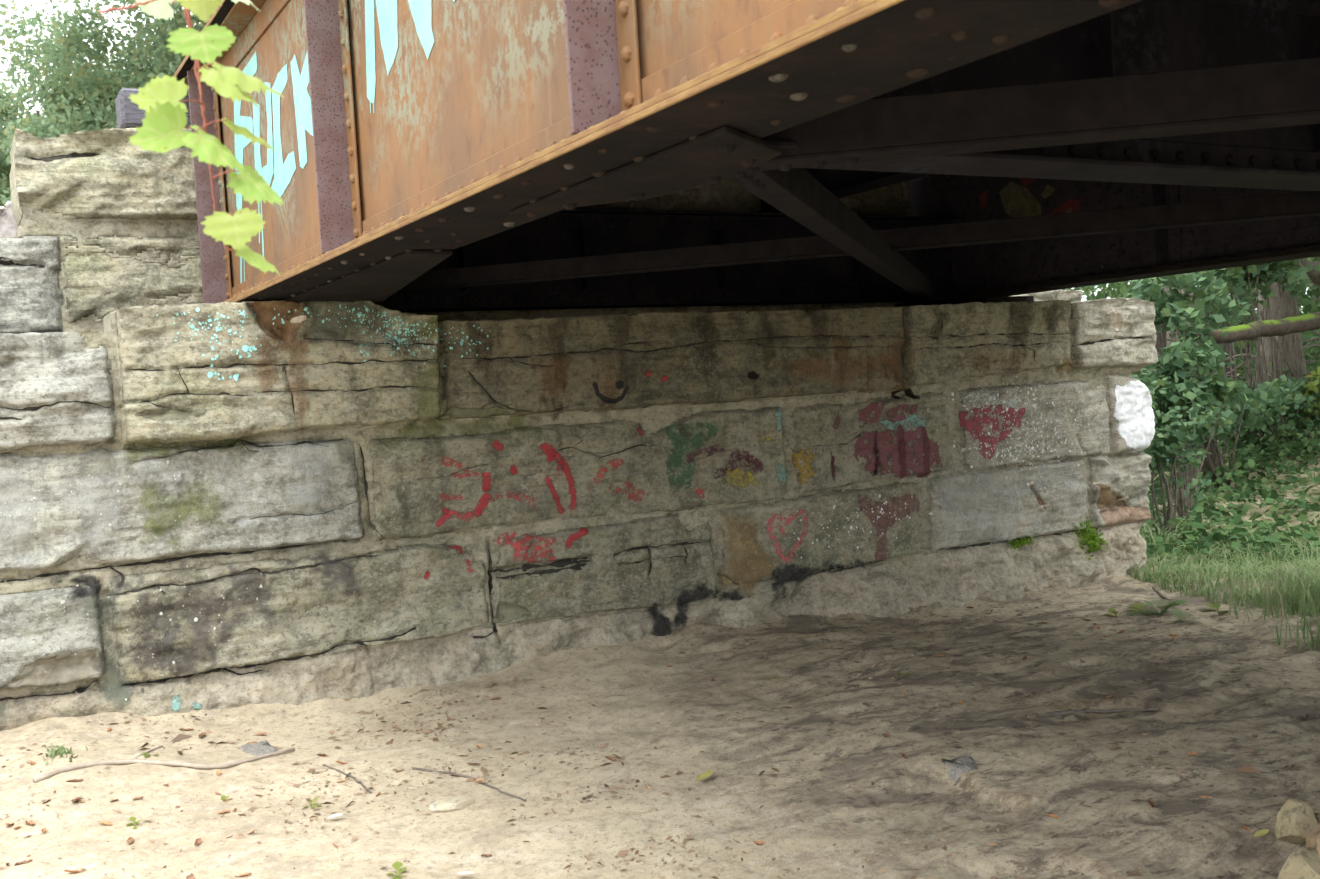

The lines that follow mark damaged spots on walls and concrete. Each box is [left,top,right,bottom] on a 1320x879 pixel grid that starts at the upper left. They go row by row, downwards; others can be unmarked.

crack [0,257,45,268]
water stain [303,301,389,345]
crack [0,322,1143,595]
crack [473,541,707,643]
crack [0,628,416,701]